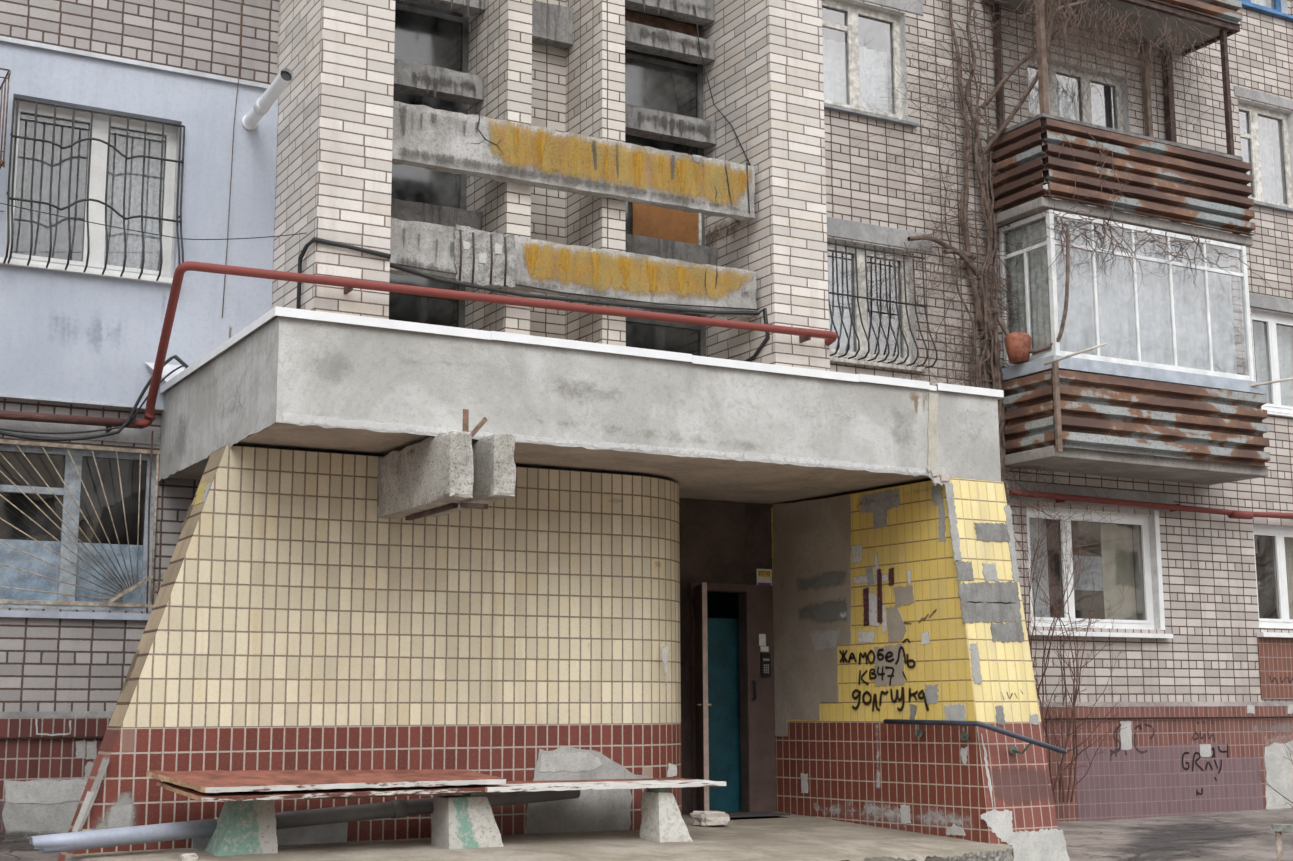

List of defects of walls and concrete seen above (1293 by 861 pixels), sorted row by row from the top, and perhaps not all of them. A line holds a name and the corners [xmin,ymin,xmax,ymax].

spalling [453,224,518,288]
peeling [926,466,962,561]
peeling [958,505,1024,685]
peeling [909,684,939,720]
peeling [995,705,1006,725]
peeling [5,779,94,832]